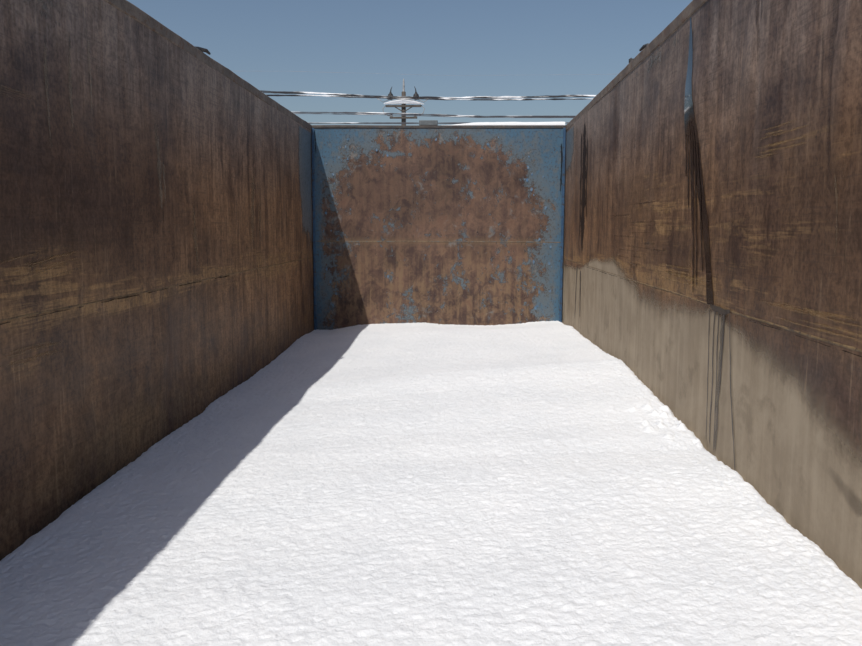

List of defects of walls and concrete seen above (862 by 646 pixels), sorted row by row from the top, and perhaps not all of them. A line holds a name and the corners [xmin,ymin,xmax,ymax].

damp [579,125,588,248]
damp [684,18,735,469]